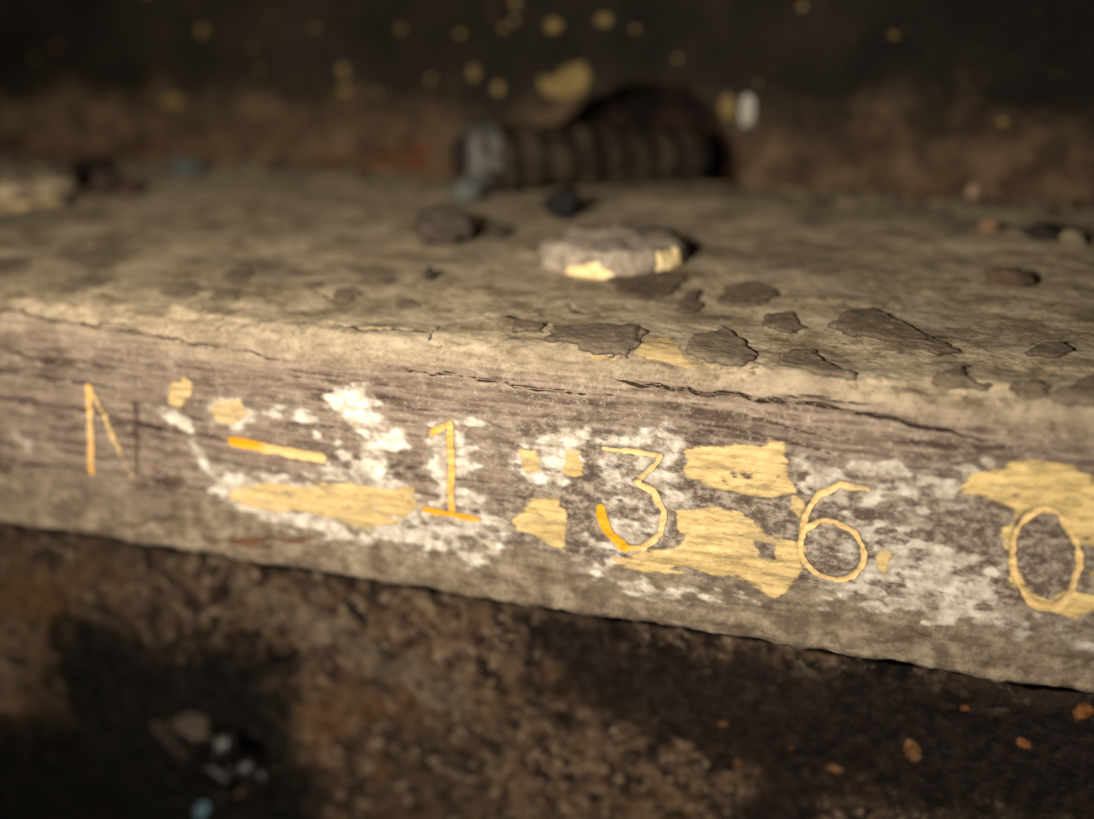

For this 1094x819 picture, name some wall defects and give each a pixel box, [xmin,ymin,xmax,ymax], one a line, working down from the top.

crack [269,271,441,341]
crack [0,308,279,360]
crack [393,355,987,443]
rust [1075,704,1093,719]
rust [906,740,920,761]